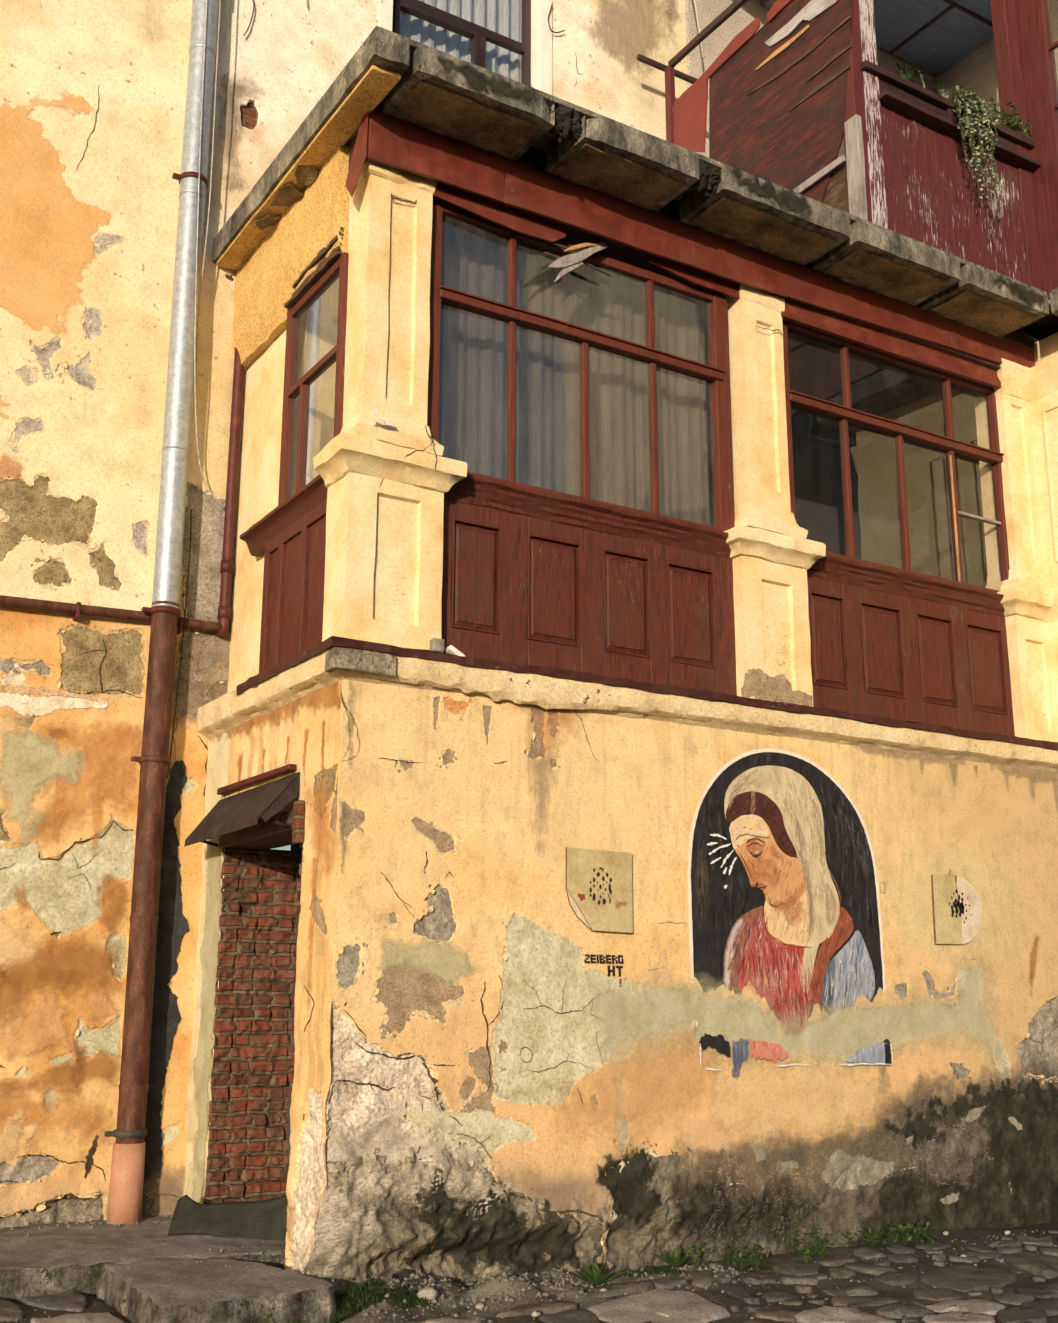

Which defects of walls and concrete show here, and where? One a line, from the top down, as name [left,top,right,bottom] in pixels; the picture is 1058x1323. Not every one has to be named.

leakage [593,0,677,68]
peeling [0,473,122,591]
peeling [0,624,148,699]
spalling [741,668,813,707]
peeling [0,796,136,938]
spalling [413,884,458,943]
peeling [105,932,128,982]
peeling [45,1015,121,1067]
spalling [84,1135,99,1178]
crack [304,975,613,1264]
peeling [289,910,1058,1276]
leakage [597,1062,1058,1262]